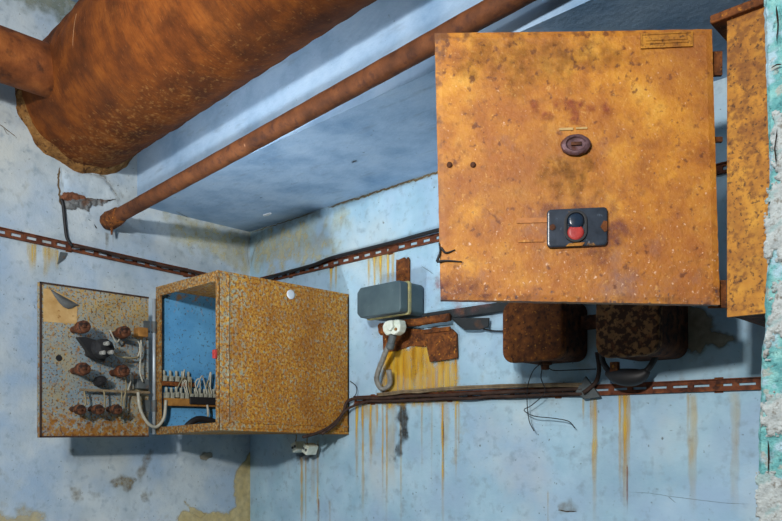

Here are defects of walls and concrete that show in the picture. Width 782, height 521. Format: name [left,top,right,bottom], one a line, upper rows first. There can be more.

spalling [57,167,118,229]
peeling [763,110,782,264]
peeling [763,280,782,361]
rust [356,346,457,432]
rust [619,395,627,452]
peeling [760,391,782,437]
peeling [178,453,250,521]
peeling [755,471,782,521]